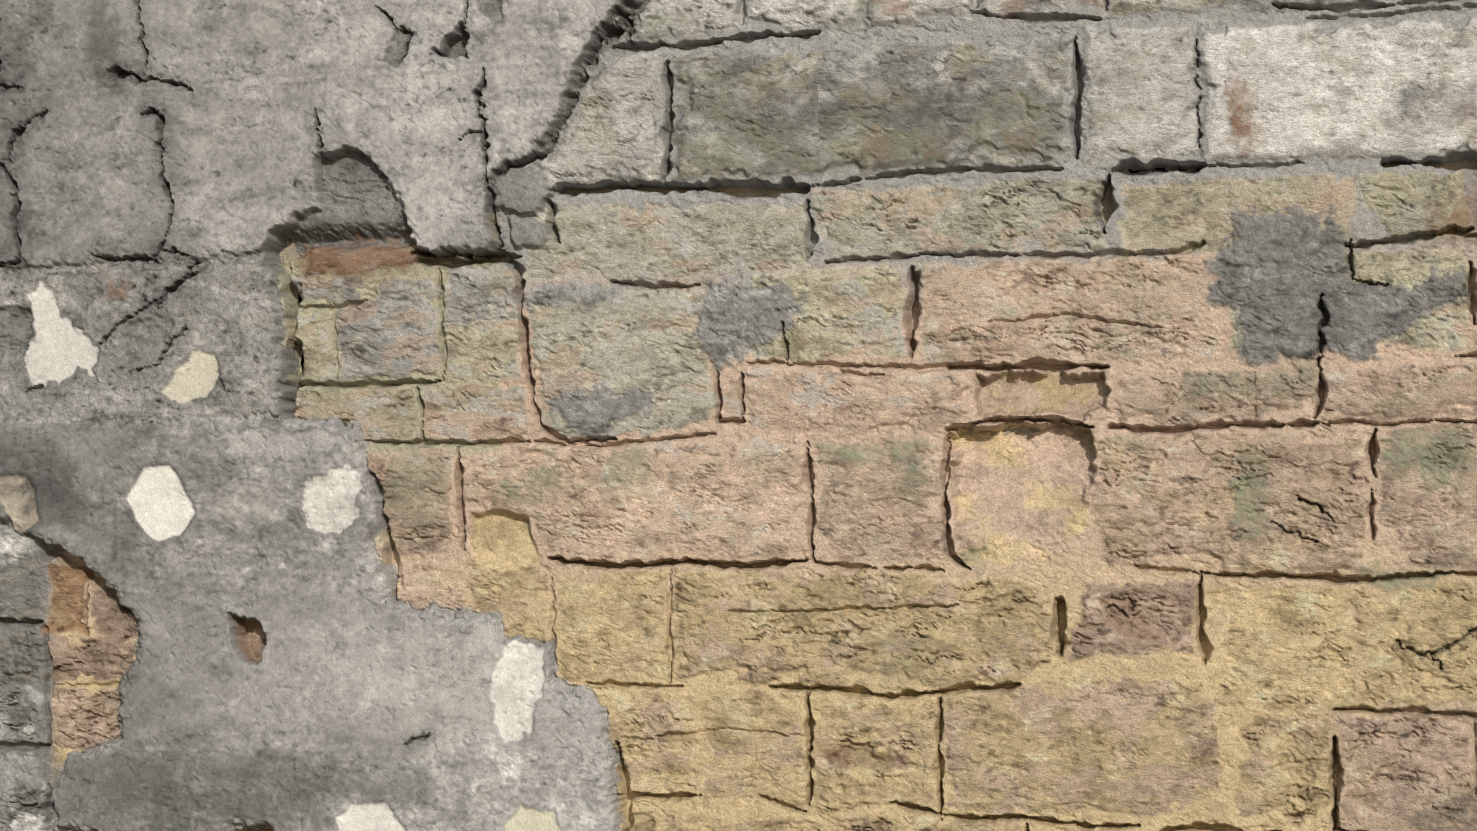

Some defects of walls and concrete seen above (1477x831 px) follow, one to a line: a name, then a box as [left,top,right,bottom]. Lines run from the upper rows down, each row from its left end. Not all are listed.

crack [92,0,199,346]
crack [316,118,324,156]
crack [376,7,413,50]
spalling [376,29,413,69]
spalling [434,0,504,70]
spalling [480,0,636,214]
peeling [0,271,108,388]
peeling [154,352,220,407]
peeling [127,461,196,542]
spalling [214,150,624,831]
spalling [947,369,1111,570]
peeling [0,472,152,831]